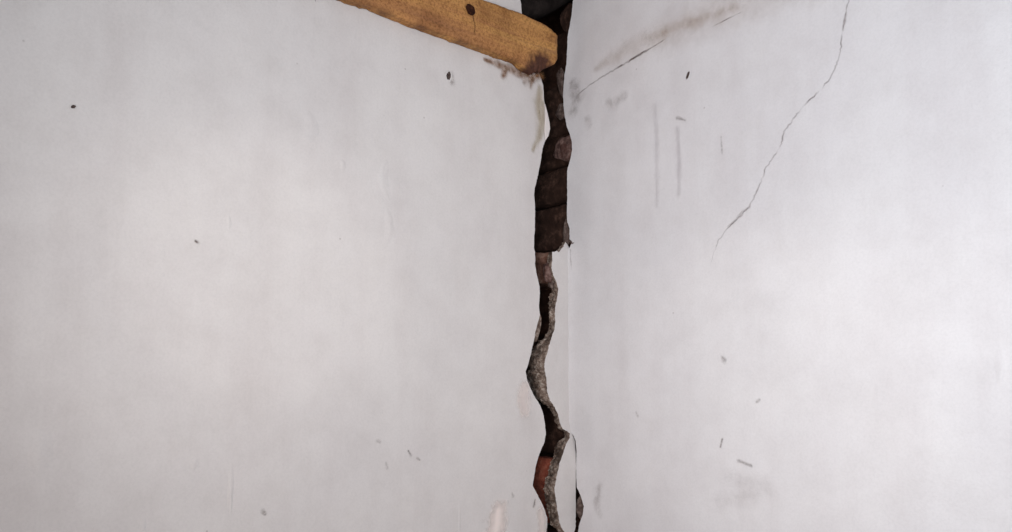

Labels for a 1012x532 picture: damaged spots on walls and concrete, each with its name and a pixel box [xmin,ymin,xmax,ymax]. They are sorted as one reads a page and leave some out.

crack [560,3,573,36]
crack [526,68,584,532]